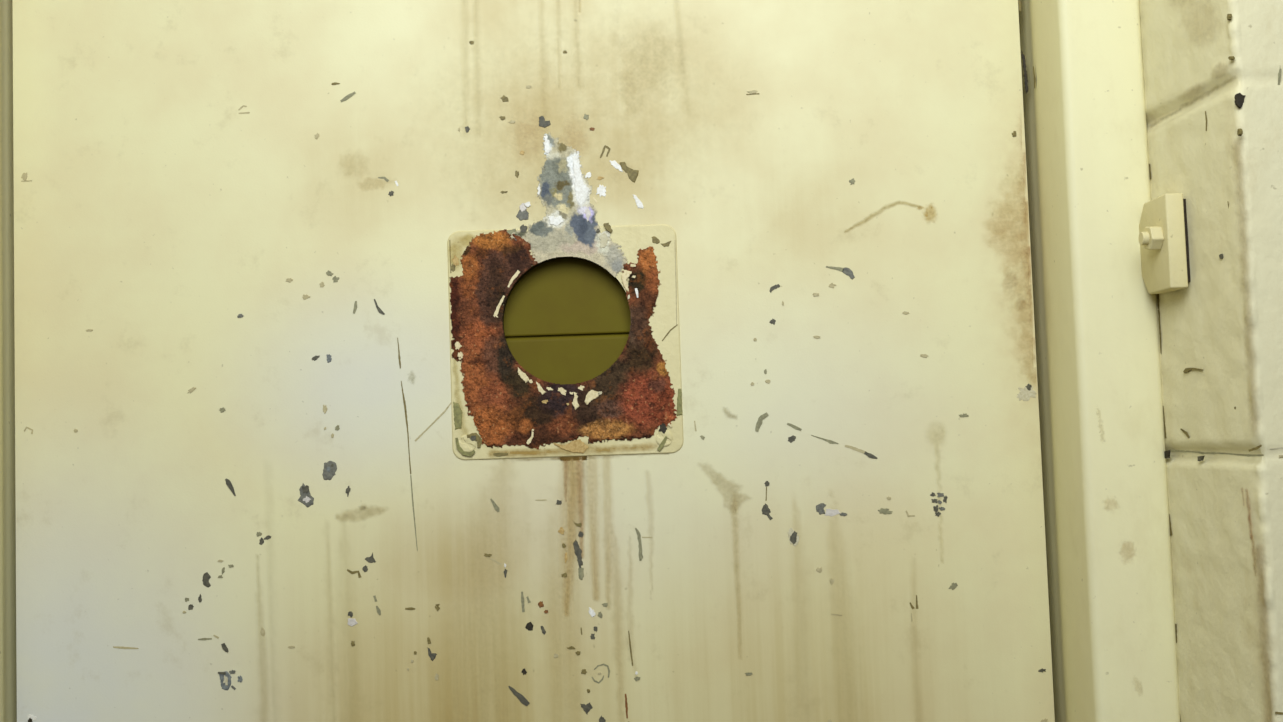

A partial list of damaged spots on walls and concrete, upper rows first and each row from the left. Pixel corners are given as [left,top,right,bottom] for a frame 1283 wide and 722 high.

peeling [507,116,644,299]
corrosion [449,229,677,463]
peeling [322,461,337,480]
peeling [298,483,314,508]
peeling [762,481,773,520]
peeling [816,503,847,517]
peeling [930,492,948,517]
peeling [787,528,800,546]
peeling [347,553,376,578]
peeling [182,560,234,613]
peeling [347,611,358,647]
peeling [218,670,243,690]